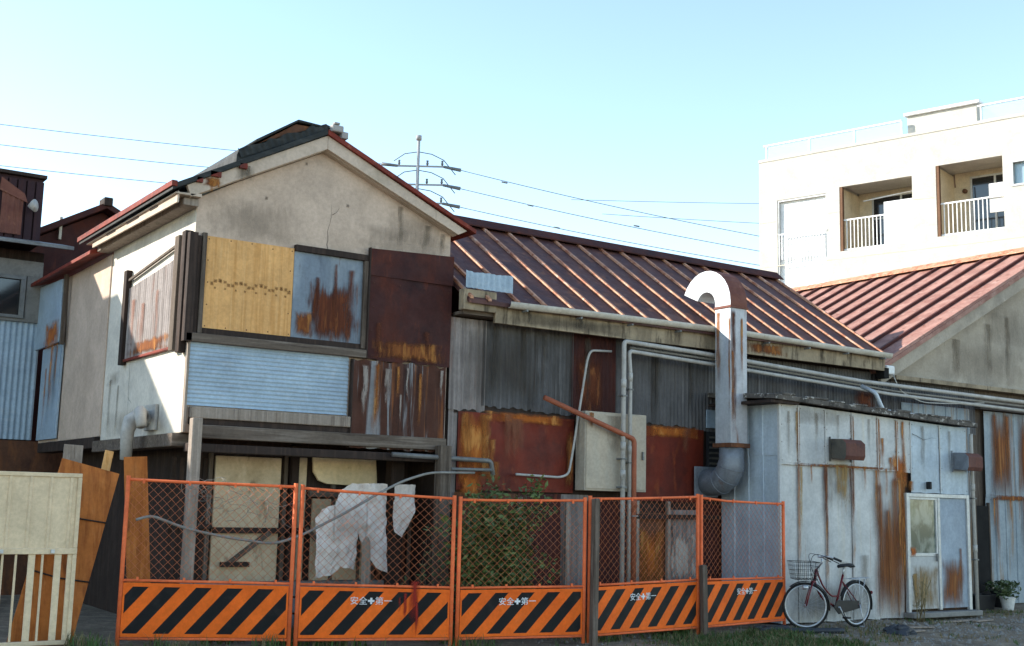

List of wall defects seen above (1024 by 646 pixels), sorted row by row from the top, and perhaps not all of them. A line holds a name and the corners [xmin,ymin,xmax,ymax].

rust [43,323,58,405]
rust [130,334,166,356]
rust [296,248,454,418]
rust [460,411,560,494]
rust [651,426,697,438]
rust [795,411,962,607]
rust [993,415,1024,543]